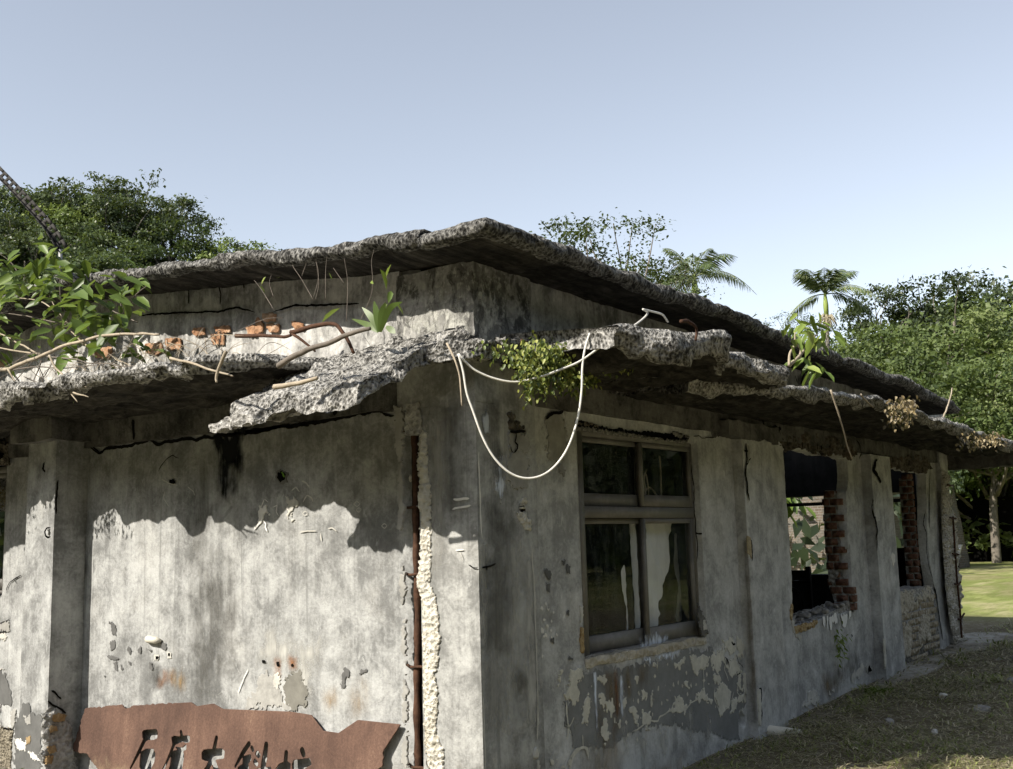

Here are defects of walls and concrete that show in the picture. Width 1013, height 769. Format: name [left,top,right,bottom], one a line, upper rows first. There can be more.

leakage [213,426,246,498]
crack [743,443,751,501]
crack [871,459,881,547]
spalling [382,402,445,769]
peeling [0,619,11,641]
flaking render [0,668,78,769]
peeling [340,667,367,689]
peeling [550,603,763,769]